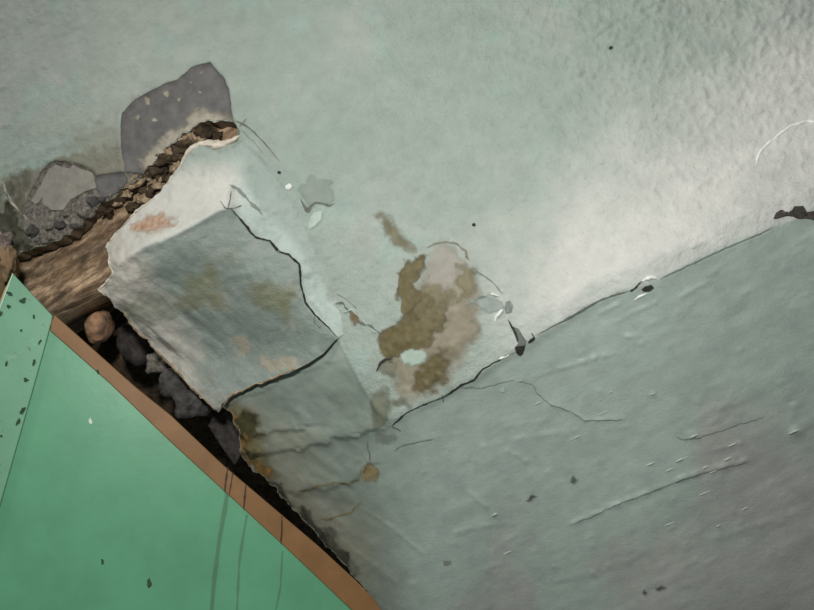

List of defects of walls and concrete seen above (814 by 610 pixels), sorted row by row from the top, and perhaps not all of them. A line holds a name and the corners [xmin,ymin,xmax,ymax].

flaking render [2,62,239,248]
crack [220,193,383,338]
damp [371,213,479,443]
crack [465,268,503,306]
crack [539,290,630,334]
crack [660,227,773,279]
crack [387,353,621,451]